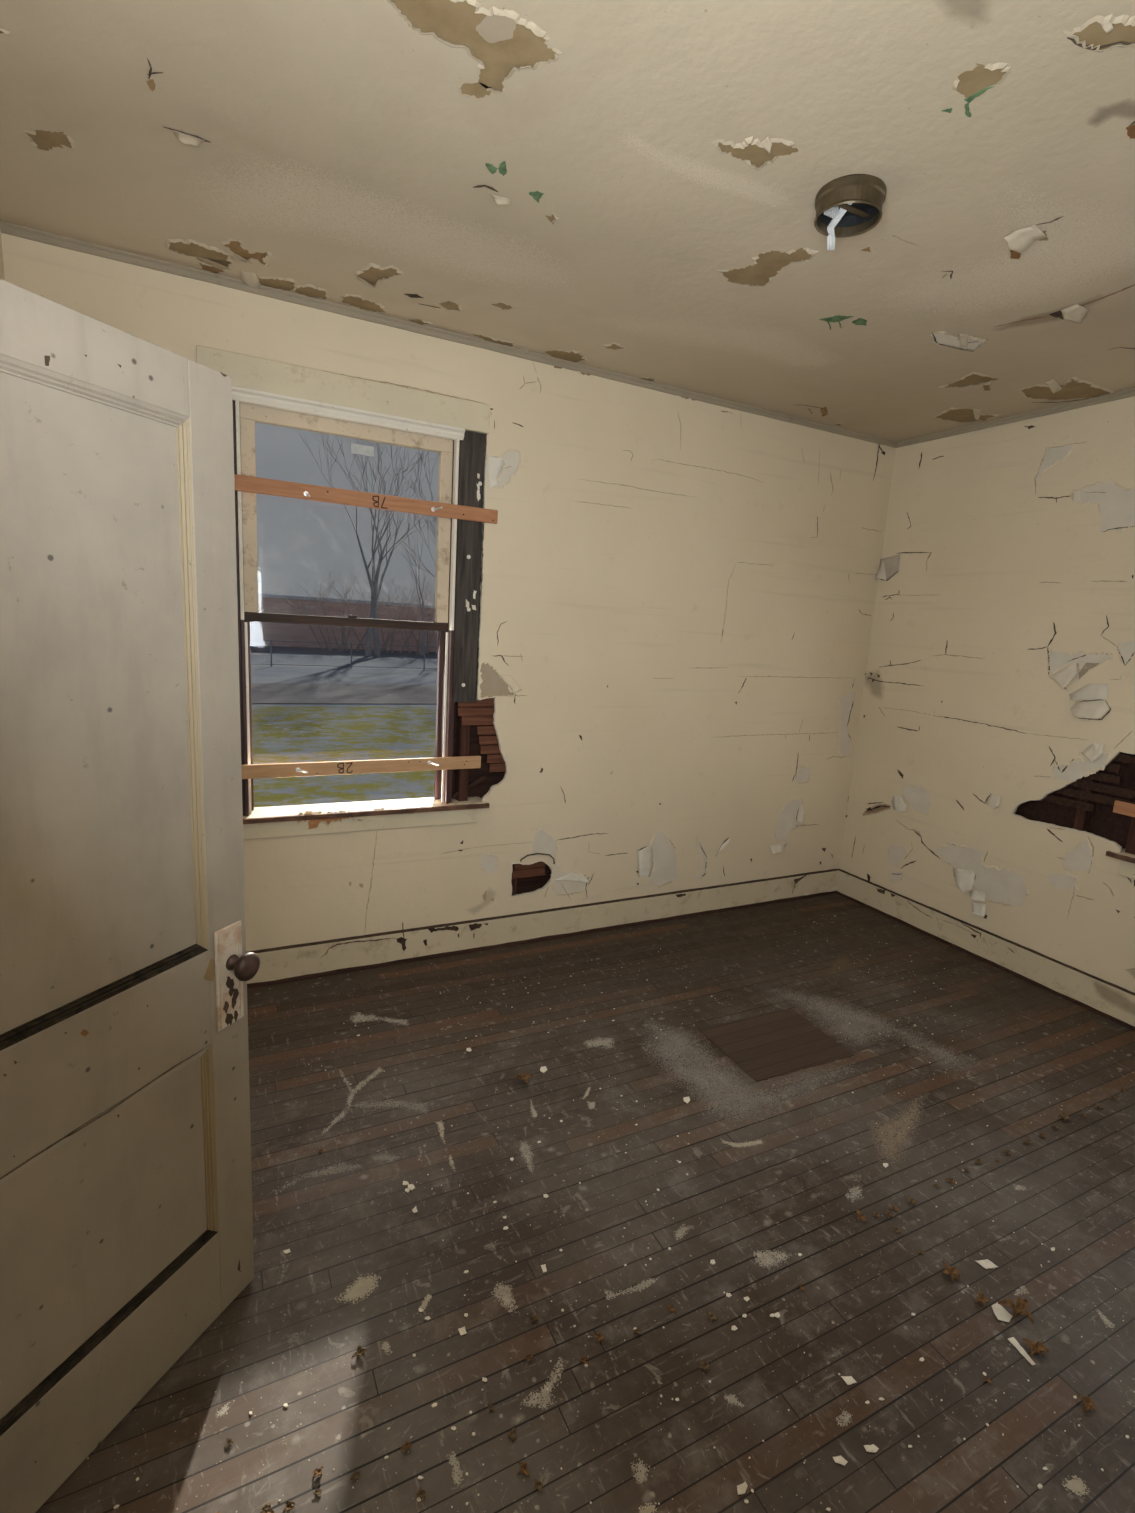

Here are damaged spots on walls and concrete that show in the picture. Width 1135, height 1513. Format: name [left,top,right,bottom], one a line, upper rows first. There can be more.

peeling [387,0,562,99]
peeling [1063,14,1135,53]
peeling [941,62,1011,118]
peeling [22,128,76,151]
peeling [711,136,798,170]
peeling [164,238,404,313]
peeling [717,247,819,287]
crack [996,284,1135,327]
peeling [315,369,529,802]
peeling [1027,615,1135,720]
peeling [1011,730,1135,852]
peeling [511,853,594,899]